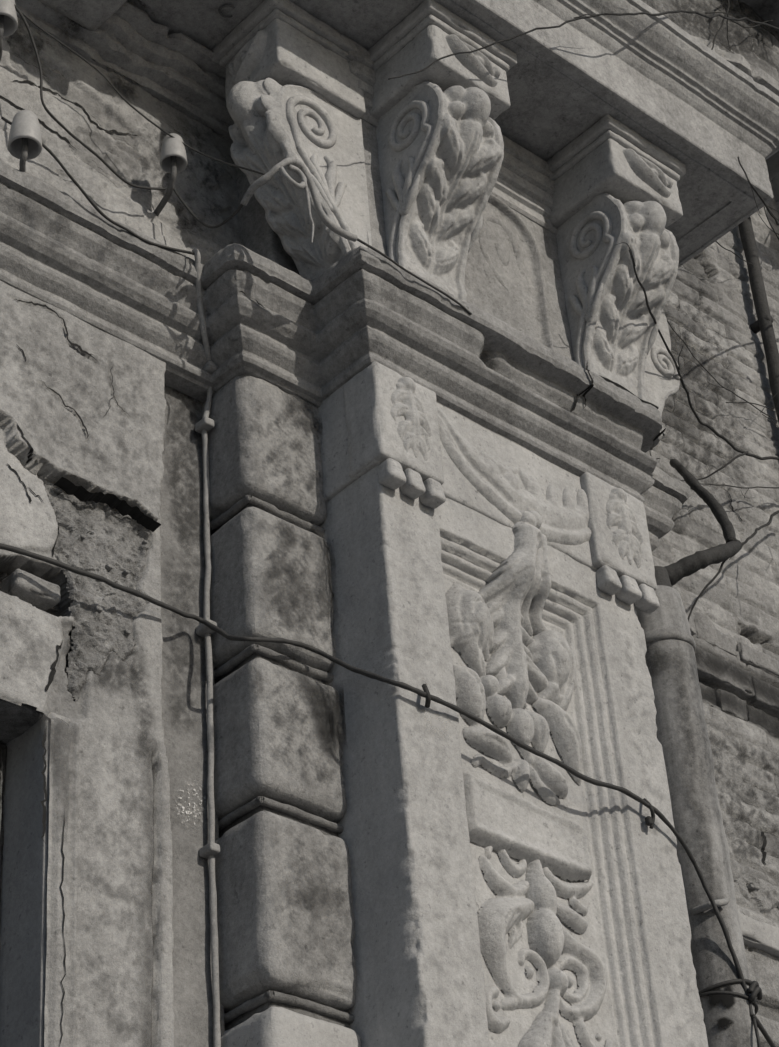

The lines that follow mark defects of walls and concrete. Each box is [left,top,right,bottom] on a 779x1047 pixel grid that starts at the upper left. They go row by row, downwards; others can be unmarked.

crack [0,80,141,149]
crack [13,299,130,438]
crack [570,361,667,459]
flaking render [37,475,150,701]
crack [45,641,63,691]
leakage [303,675,345,744]
crack [41,726,66,1047]